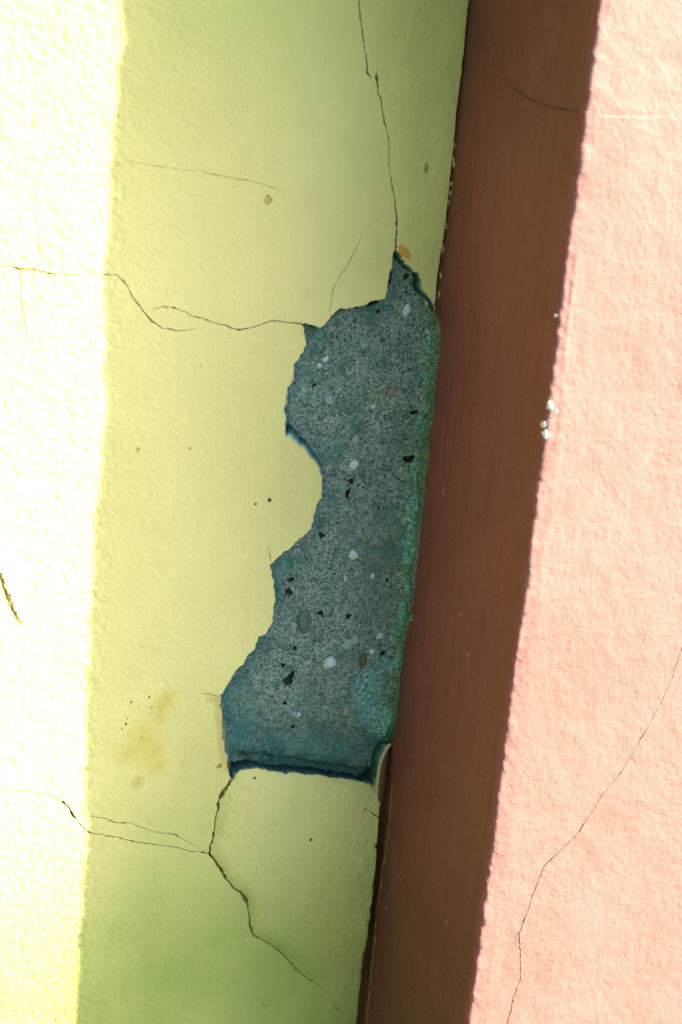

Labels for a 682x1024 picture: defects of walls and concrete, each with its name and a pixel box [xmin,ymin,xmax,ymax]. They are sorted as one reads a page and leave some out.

crack [0,265,302,349]
crack [125,157,284,192]
crack [329,0,398,310]
flaking render [216,244,441,1024]
crack [0,779,343,1013]
crack [507,648,682,1024]